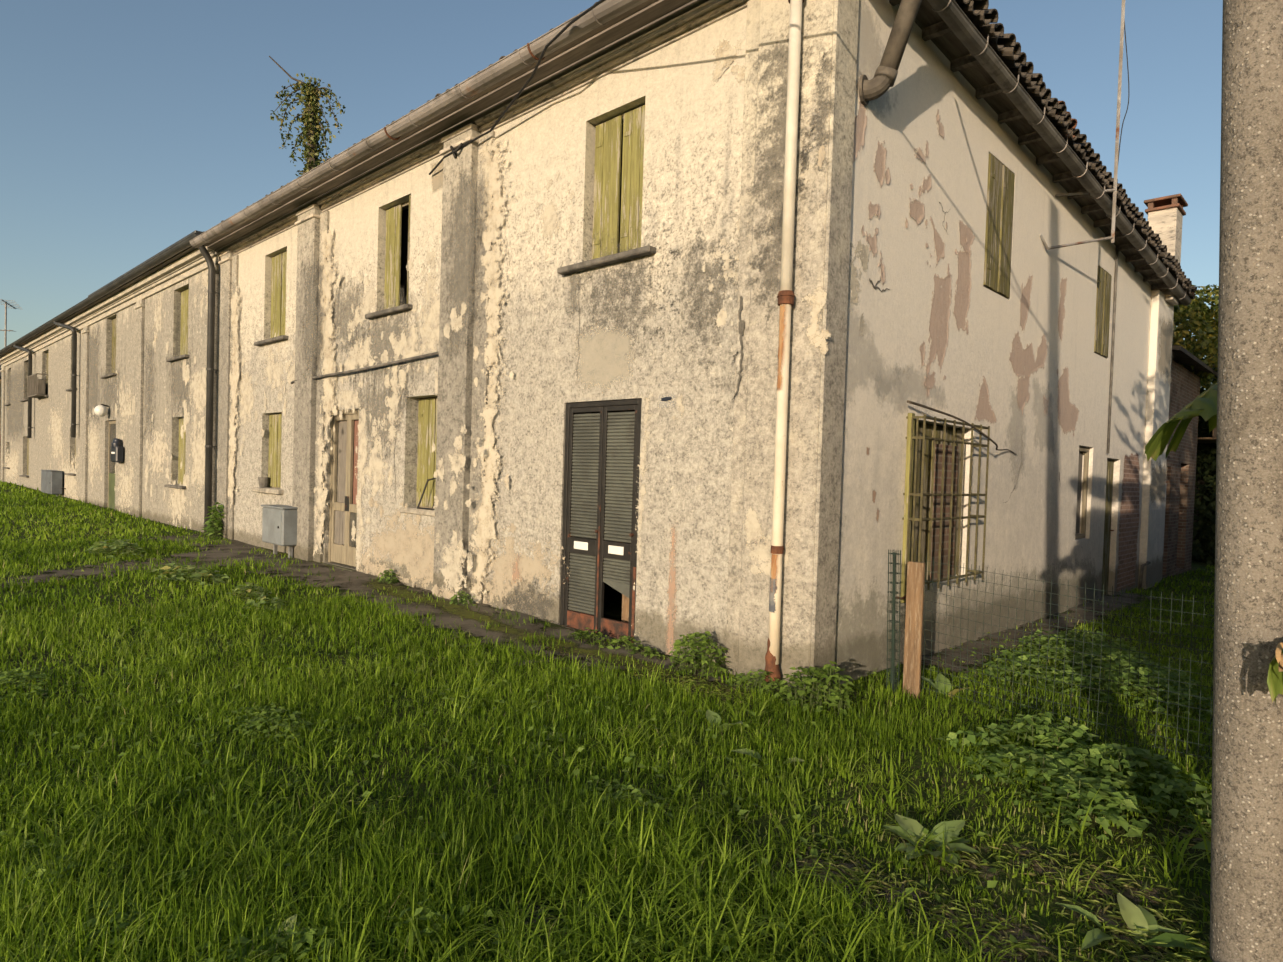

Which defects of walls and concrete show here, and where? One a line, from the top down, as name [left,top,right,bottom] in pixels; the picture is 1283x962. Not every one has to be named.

water stain [569,34,834,364]
peeling [47,283,295,528]
peeling [194,269,208,316]
water stain [303,261,419,458]
peeling [313,135,529,614]
corrosion [777,305,785,390]
peeling [801,286,831,355]
peeling [848,204,885,337]
water stain [503,580,560,625]